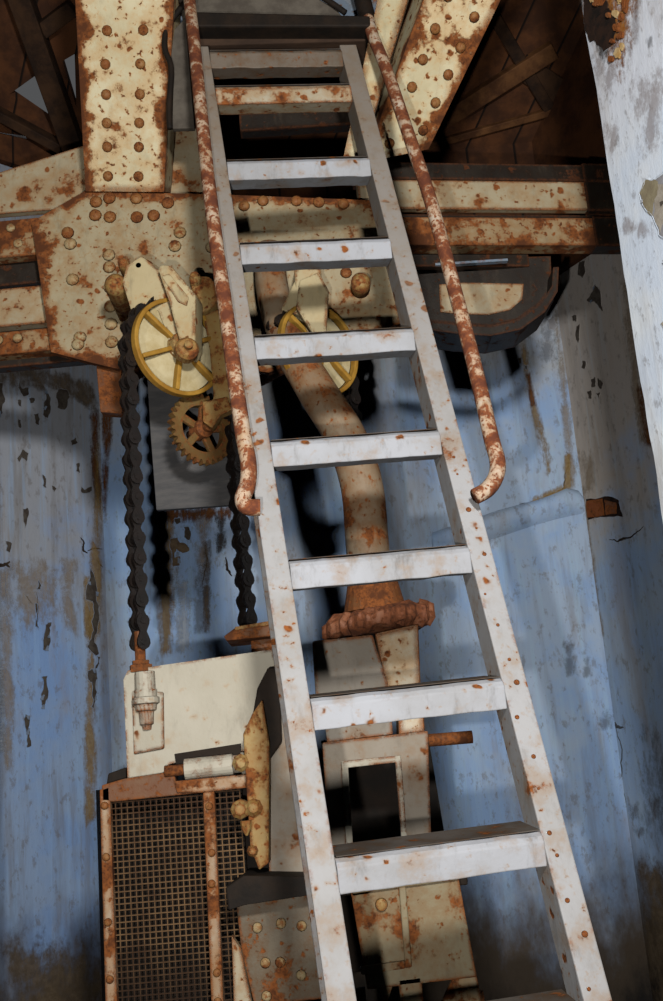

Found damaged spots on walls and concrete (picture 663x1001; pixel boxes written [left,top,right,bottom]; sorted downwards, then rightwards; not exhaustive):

spalling [581,0,637,75]
peeling [639,172,663,239]
peeling [572,315,580,343]
peeling [0,382,70,425]
peeling [587,377,604,399]
crack [609,527,643,542]
peeling [35,603,52,651]
peeling [85,567,100,708]
peeling [40,676,49,709]
peeling [24,714,32,748]